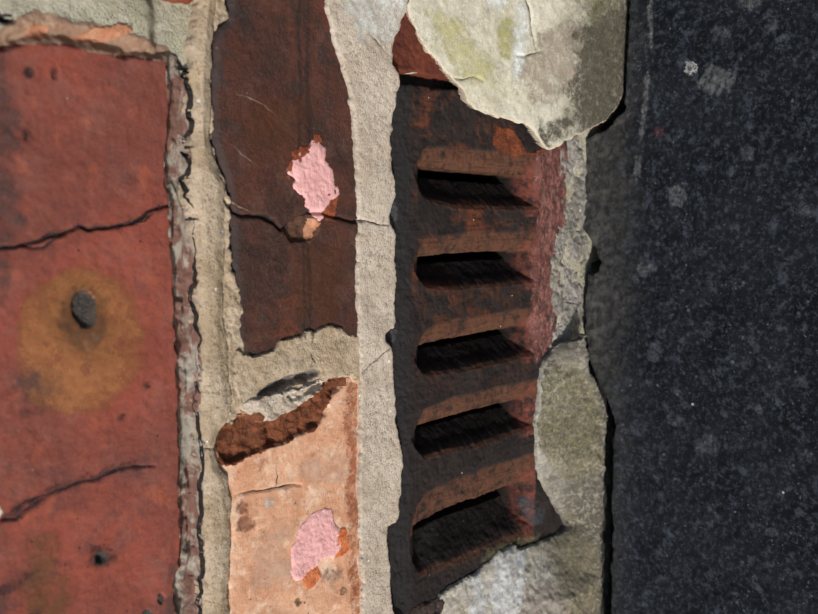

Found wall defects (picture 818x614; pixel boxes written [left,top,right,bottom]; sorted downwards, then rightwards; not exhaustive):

spalling [285,134,322,180]
crack [3,205,168,249]
crack [224,202,384,231]
spalling [284,190,339,244]
spalling [0,10,206,614]
corrosion [18,269,144,414]
spalling [215,377,346,466]
crack [2,465,154,520]
spalling [302,566,322,590]